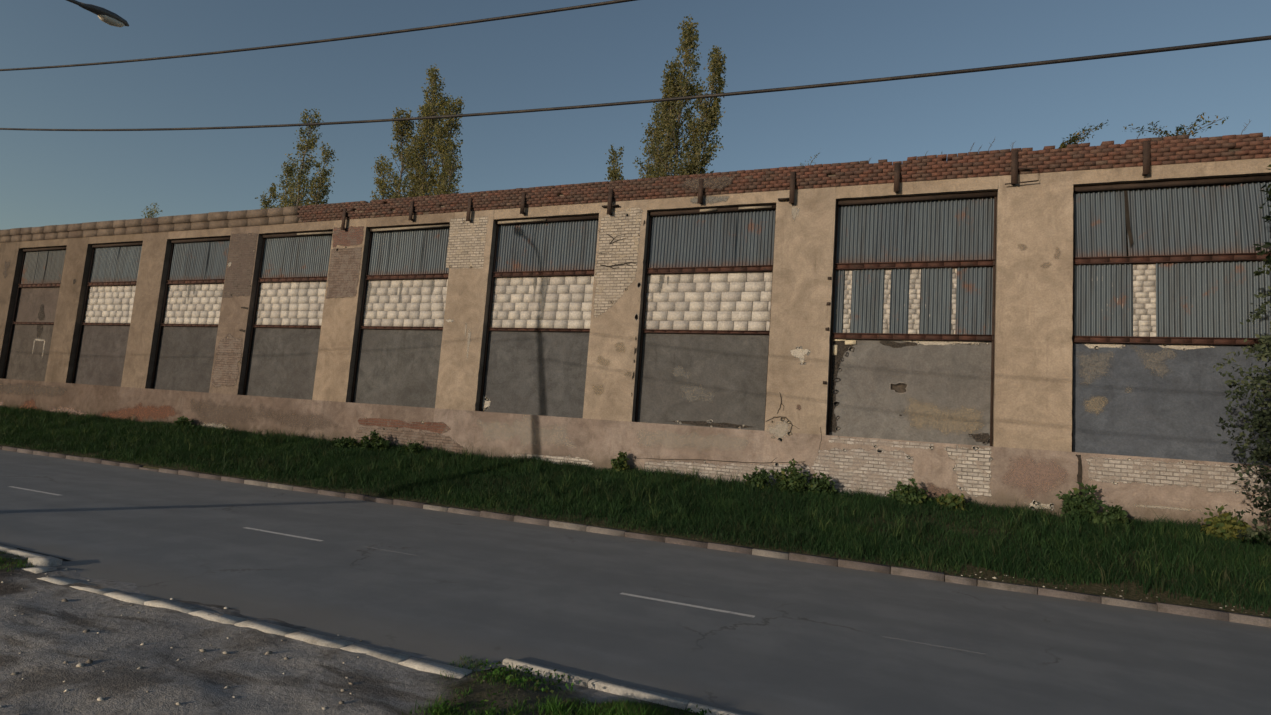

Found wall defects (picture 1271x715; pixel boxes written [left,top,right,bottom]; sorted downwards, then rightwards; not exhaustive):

flaking render [445,216,488,269]
flaking render [594,207,645,318]
flaking render [355,417,468,455]
flaking render [645,339,993,498]